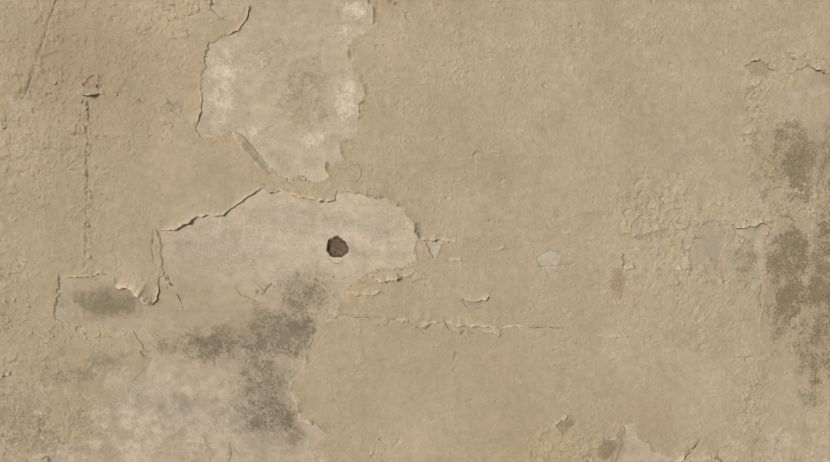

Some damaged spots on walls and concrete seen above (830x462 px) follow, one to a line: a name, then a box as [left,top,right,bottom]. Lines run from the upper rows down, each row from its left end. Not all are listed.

peeling [783,54,830,95]
peeling [55,0,463,462]
water stain [769,223,830,384]
peeling [588,421,723,462]